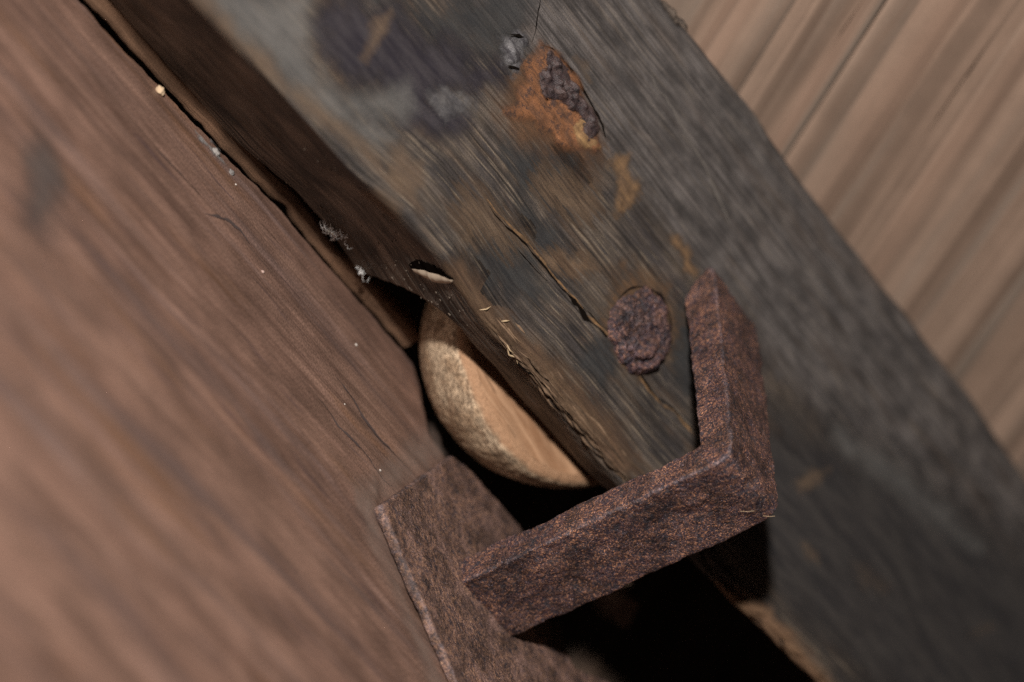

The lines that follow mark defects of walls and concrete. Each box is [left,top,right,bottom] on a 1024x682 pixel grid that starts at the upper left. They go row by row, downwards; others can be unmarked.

rust [504,44,606,193]
crack [486,199,608,338]